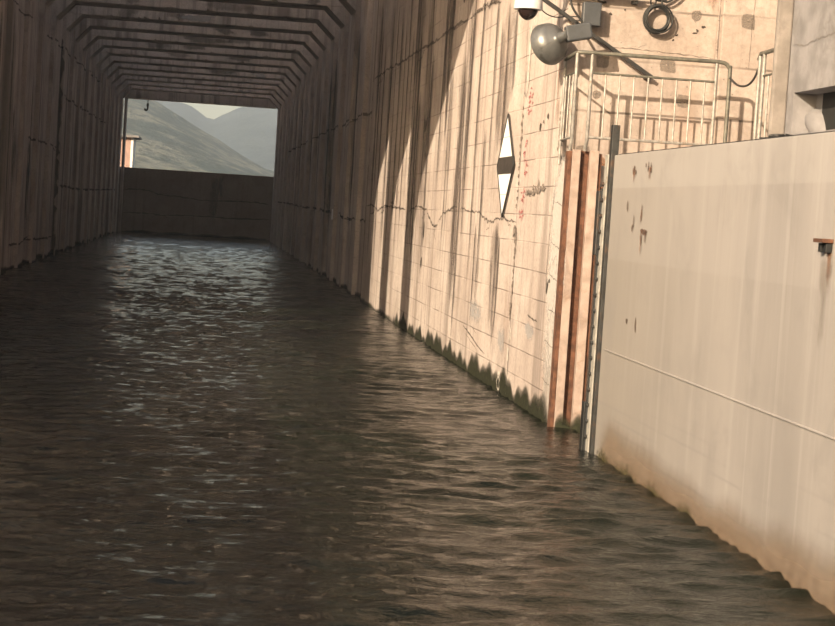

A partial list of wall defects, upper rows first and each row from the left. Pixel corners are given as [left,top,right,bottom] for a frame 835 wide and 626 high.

crack [9,35,115,250]
crack [288,0,481,152]
water stain [371,0,456,212]
water stain [451,0,484,274]
water stain [491,12,518,142]
crack [275,133,545,395]